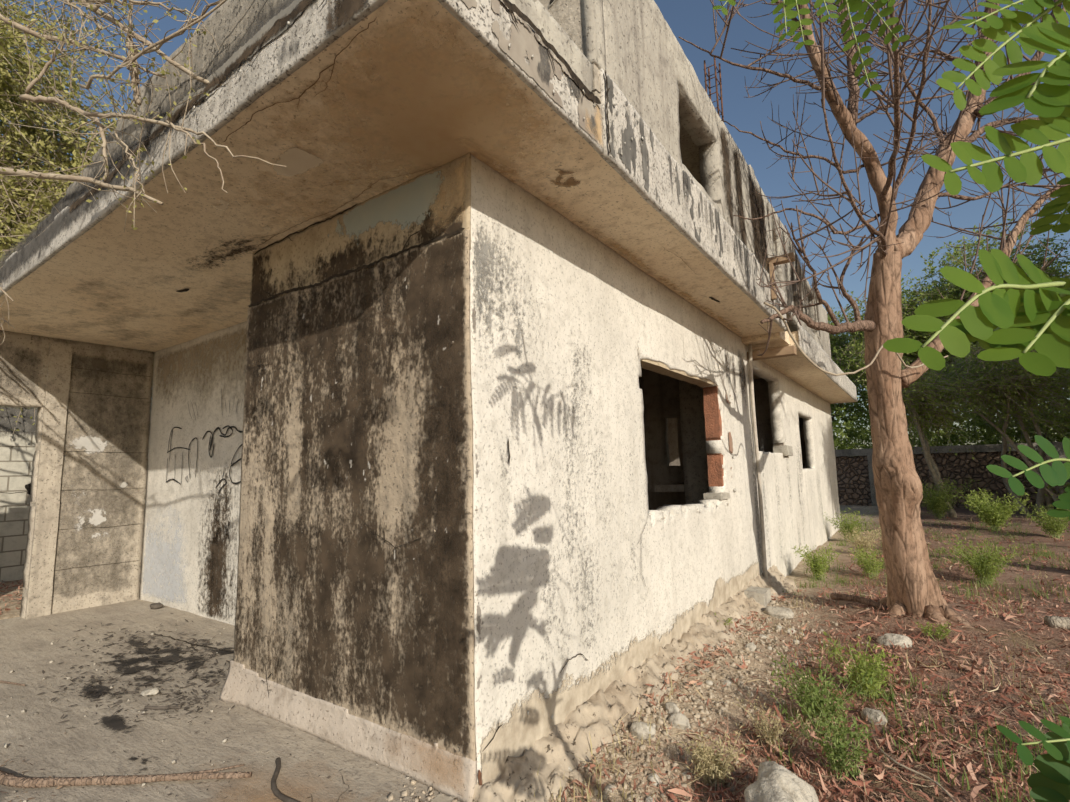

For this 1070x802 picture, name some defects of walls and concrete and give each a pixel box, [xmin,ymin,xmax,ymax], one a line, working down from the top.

peeling [457,0,780,314]
crack [248,166,442,255]
peeling [327,171,445,246]
crack [248,227,465,308]
water stain [0,351,39,392]
water stain [0,406,38,436]
water stain [71,203,532,755]
water stain [543,348,600,659]
water stain [54,517,125,593]
spalling [481,561,760,784]